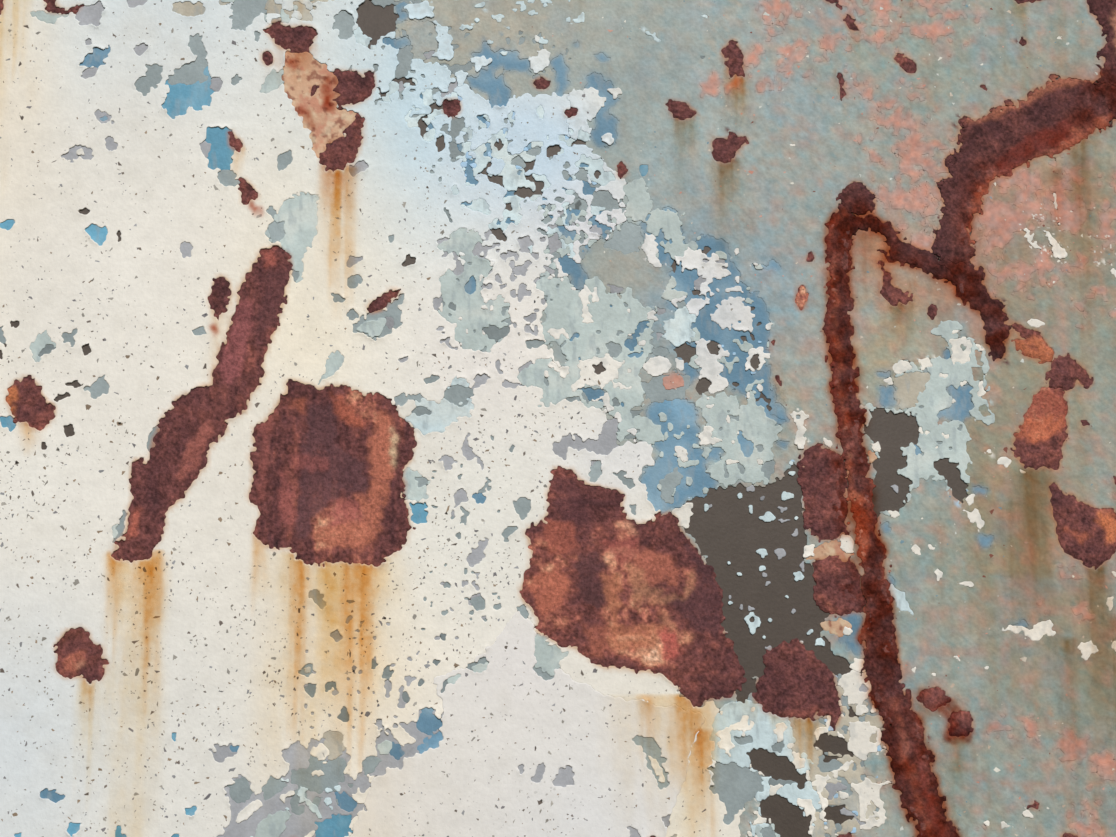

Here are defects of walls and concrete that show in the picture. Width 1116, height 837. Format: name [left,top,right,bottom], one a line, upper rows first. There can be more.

peeling [134,34,242,119]
peeling [199,127,258,205]
rust [311,69,375,172]
rust [5,375,56,431]
rust [111,246,293,563]
rust [249,379,417,567]
peeling [859,304,995,548]
rust [53,627,109,684]
peeling [430,538,501,622]
rust [519,466,841,731]
peeling [728,595,772,651]
peeling [217,650,444,837]